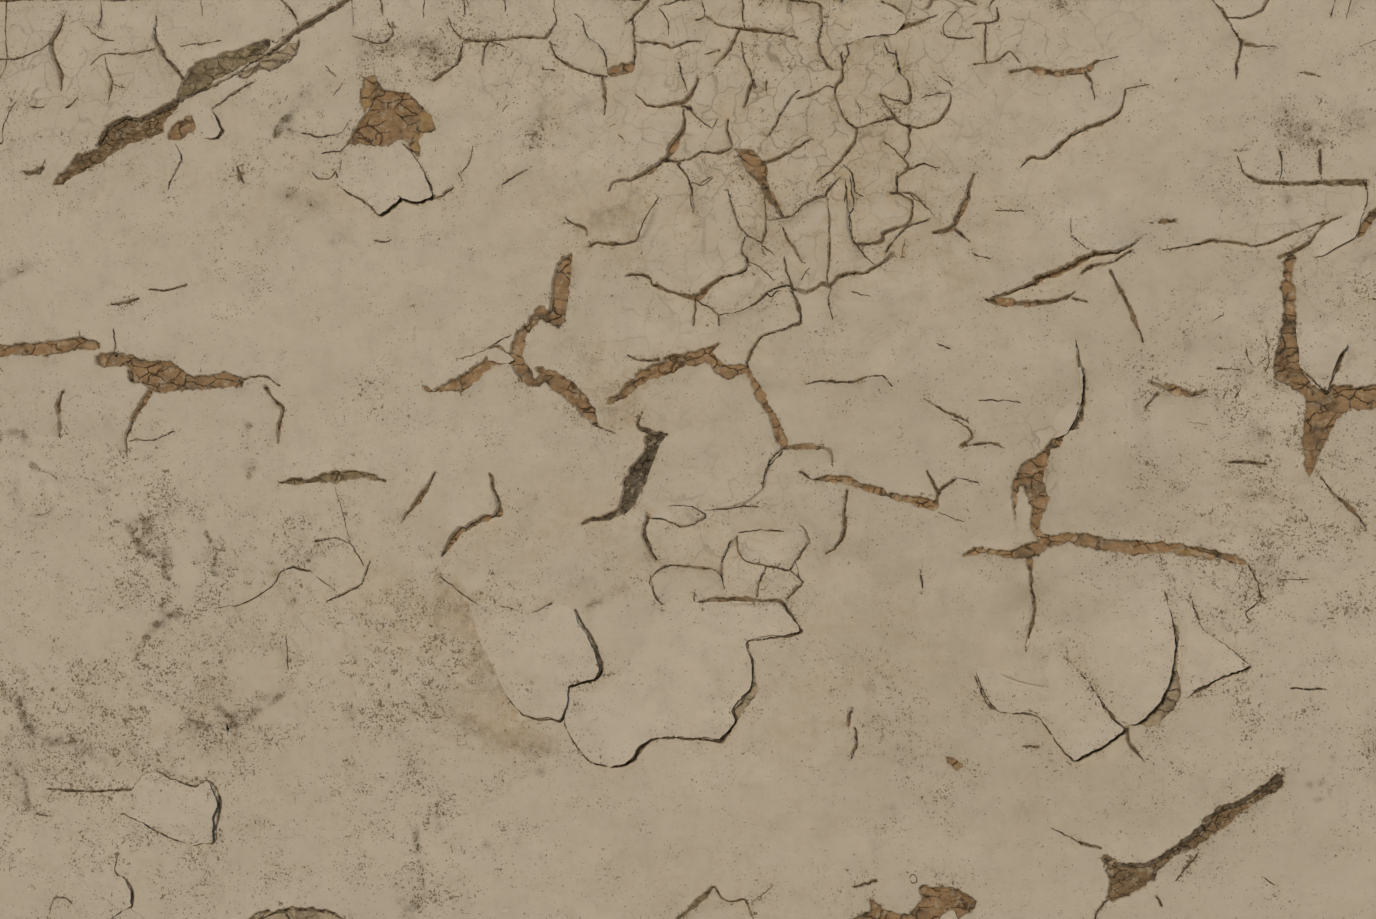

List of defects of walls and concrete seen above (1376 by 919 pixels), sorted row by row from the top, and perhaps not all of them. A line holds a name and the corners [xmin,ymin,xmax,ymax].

peeling [23,0,351,185]
peeling [337,76,436,216]
crack [351,0,1150,330]
crack [985,149,1376,342]
crack [1212,0,1276,80]
peeling [0,329,285,453]
peeling [424,255,979,522]
peeling [1274,204,1376,531]
peeling [582,412,667,560]
peeling [964,340,1262,652]
peeling [976,579,1250,762]
peeling [1094,774,1284,919]